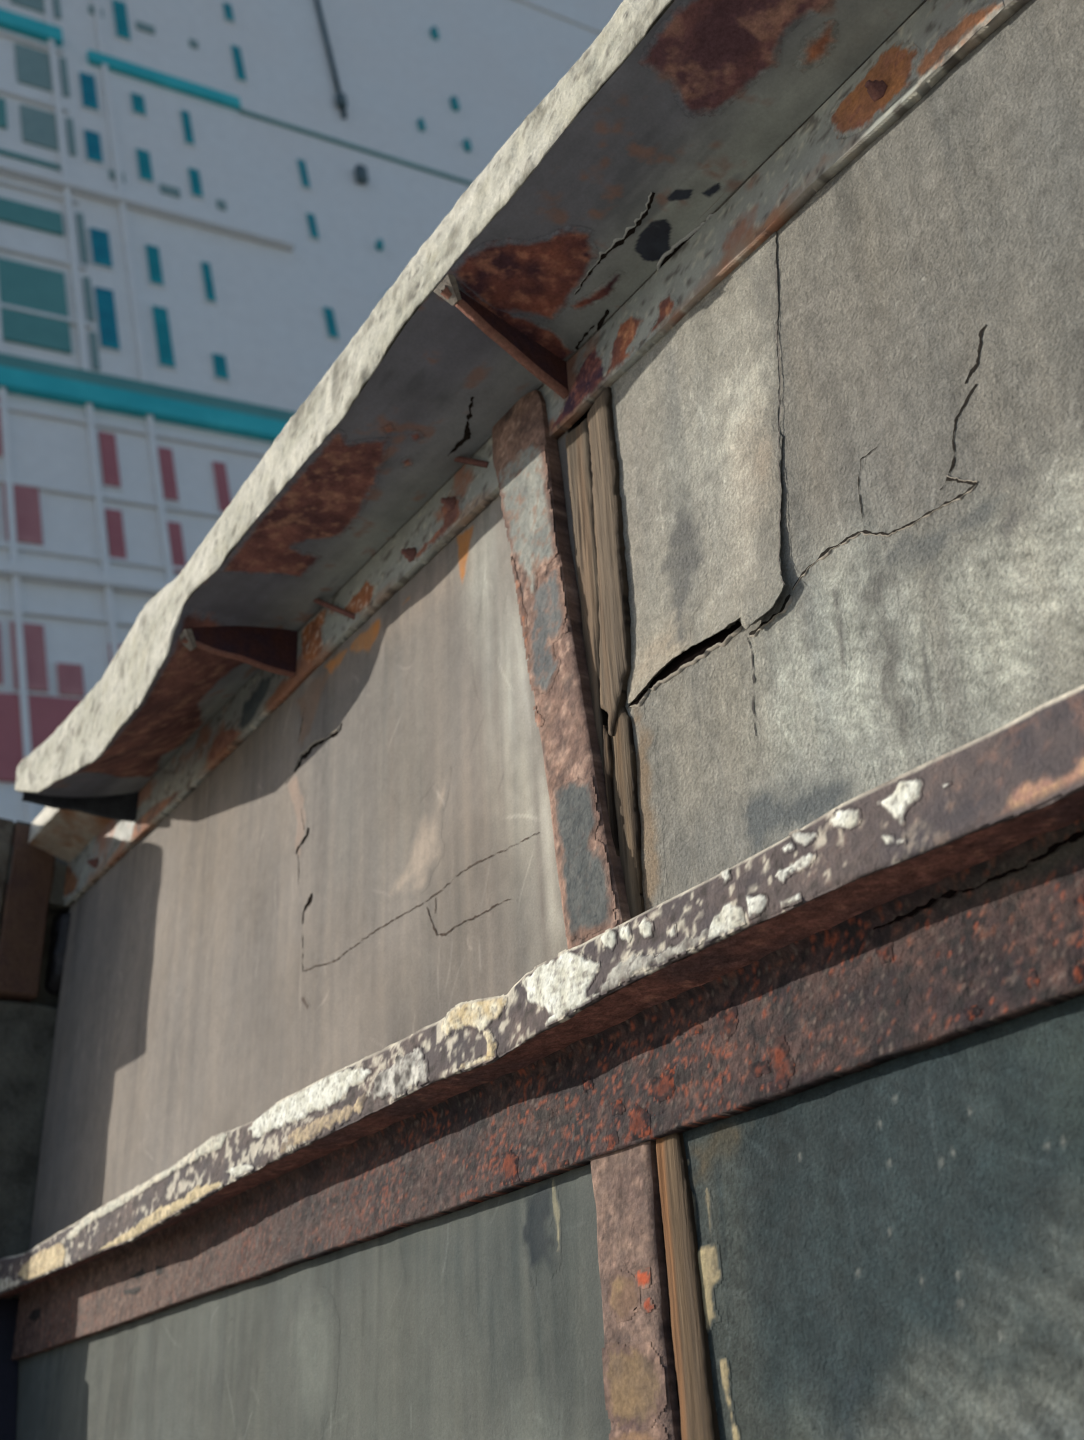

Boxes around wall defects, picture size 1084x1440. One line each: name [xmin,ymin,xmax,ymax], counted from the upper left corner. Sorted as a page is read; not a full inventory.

corrosion [825,0,1004,139]
corrosion [449,223,679,436]
crack [574,192,655,350]
crack [653,212,716,275]
corrosion [217,423,427,578]
crack [628,272,986,736]
crack [284,707,540,971]
peeling [248,1045,429,1155]
peeling [0,1132,228,1297]
peeling [93,1162,254,1254]
peeling [692,1188,723,1334]
corrosion [602,1342,668,1440]